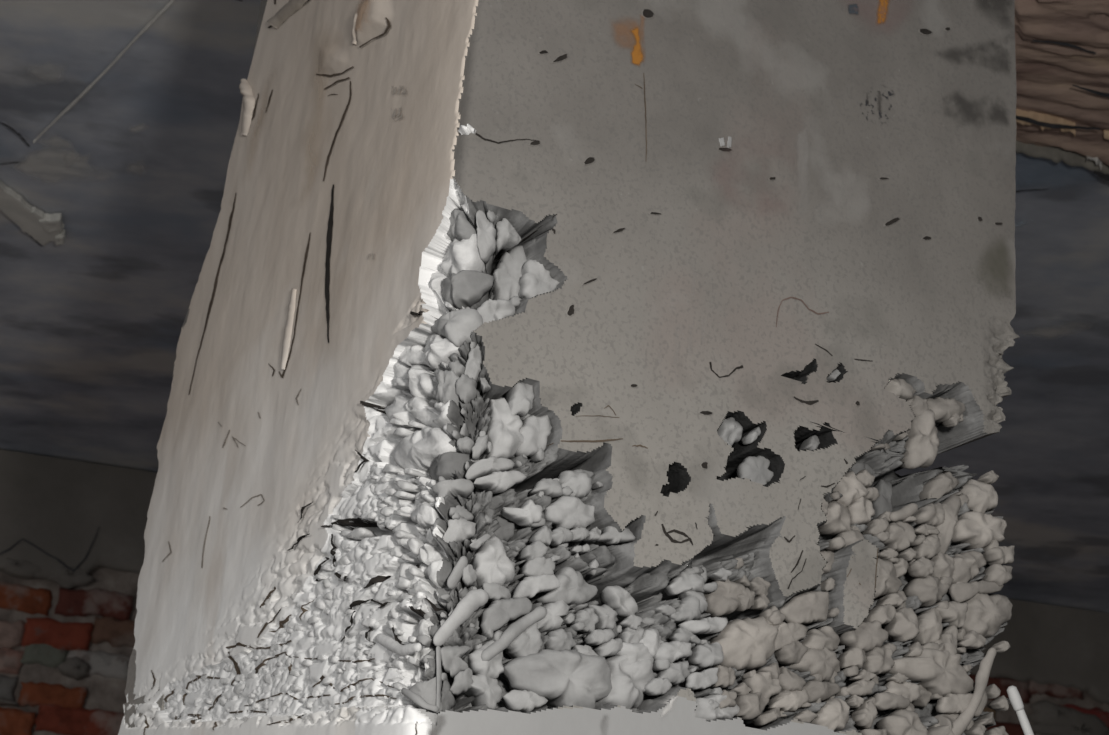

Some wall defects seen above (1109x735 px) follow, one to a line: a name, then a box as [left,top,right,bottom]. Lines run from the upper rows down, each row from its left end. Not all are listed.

corrosion [617,25,643,65]
crack [251,90,273,121]
crack [268,81,351,404]
crack [189,193,236,394]
spalling [985,315,1019,435]
crack [355,450,369,472]
crack [360,401,387,414]
spalling [660,462,691,497]
spalling [698,410,785,487]
spalling [794,421,845,451]
flaking render [0,558,139,735]
flaking render [969,674,1109,735]